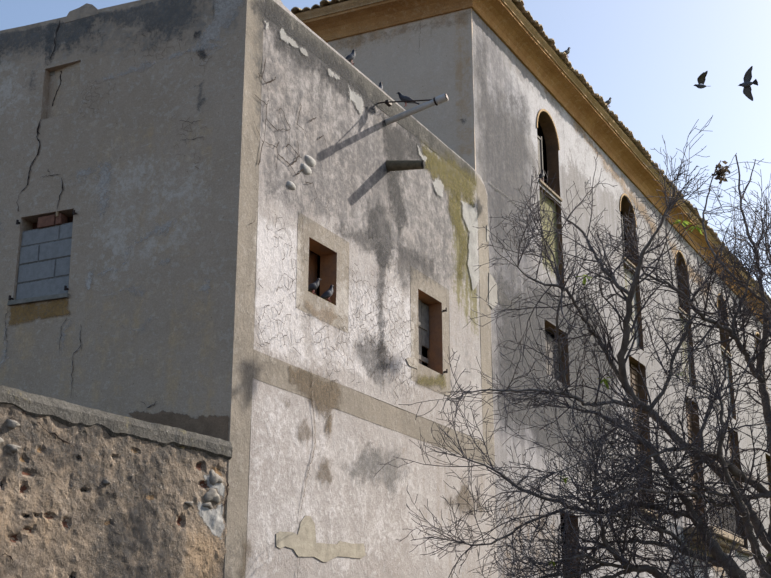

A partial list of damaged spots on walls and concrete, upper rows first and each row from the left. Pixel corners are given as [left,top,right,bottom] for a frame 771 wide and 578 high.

leakage [252,3,377,111]
crack [16,20,63,211]
crack [254,59,331,224]
leakage [383,117,426,169]
leakage [340,171,433,381]
leakage [448,193,474,278]
crack [250,214,418,529]
spalling [129,411,229,441]
spalling [196,463,225,539]